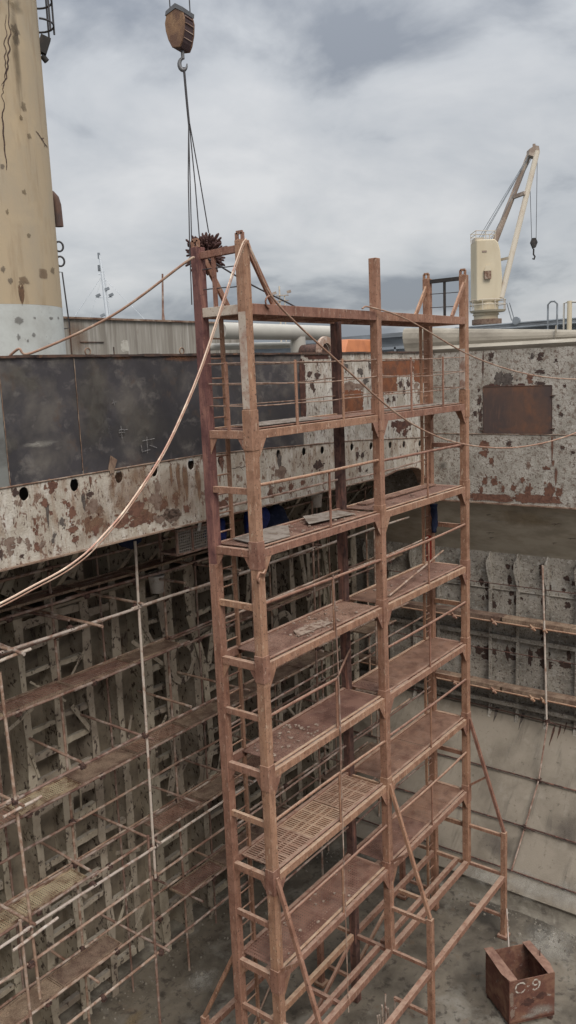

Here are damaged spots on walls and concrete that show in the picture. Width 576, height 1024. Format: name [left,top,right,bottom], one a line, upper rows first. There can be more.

crack [1,0,11,170]
peeling [299,358,321,417]
peeling [385,379,424,403]
peeling [473,352,558,426]
peeling [391,420,412,438]
peeling [268,465,305,498]
peeling [478,440,563,499]
peeling [0,478,190,560]